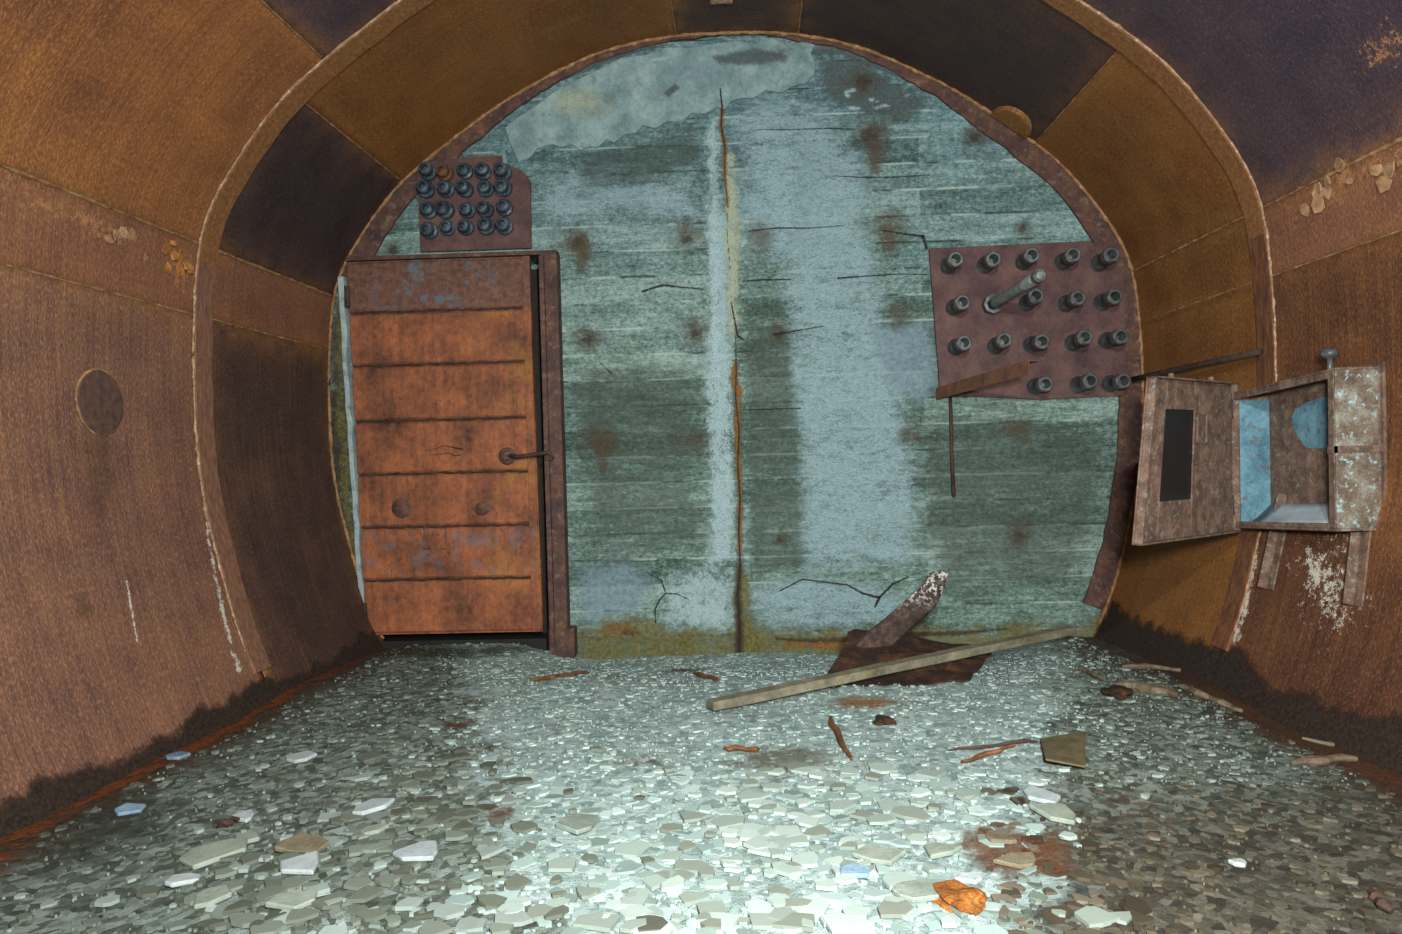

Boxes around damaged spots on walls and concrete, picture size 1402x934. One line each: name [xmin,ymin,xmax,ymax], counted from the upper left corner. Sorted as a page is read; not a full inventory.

rust [1358,17,1402,74]
damp [536,100,932,660]
crack [780,576,909,607]
damp [907,623,1042,644]
damp [1066,555,1402,778]
damp [1287,533,1352,634]
rust [0,647,389,874]